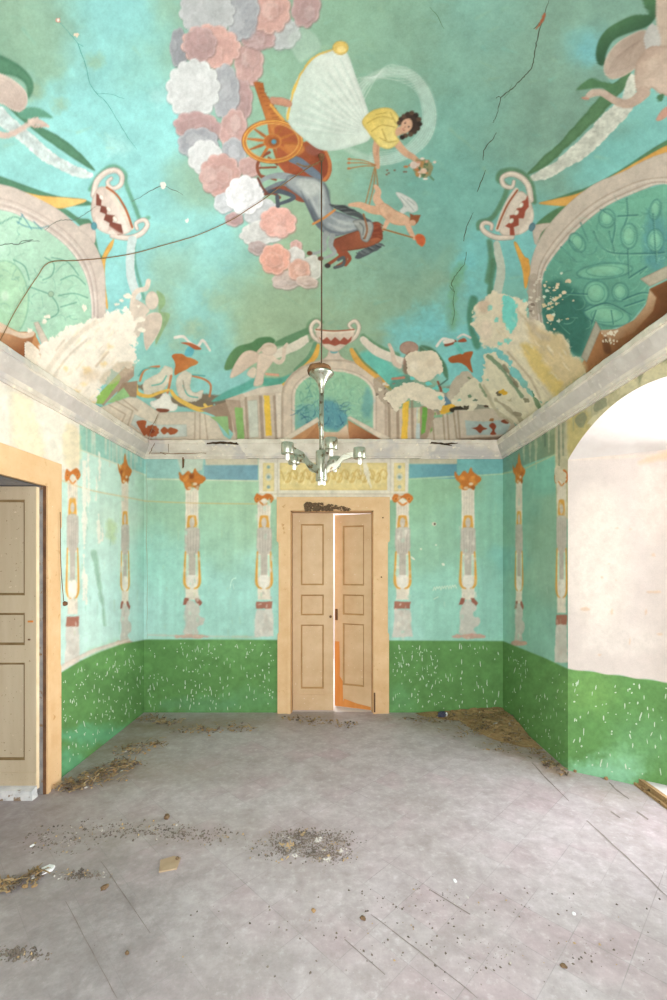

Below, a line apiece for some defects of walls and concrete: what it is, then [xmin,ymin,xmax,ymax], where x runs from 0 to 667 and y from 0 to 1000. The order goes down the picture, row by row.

crack [61,24,136,148]
crack [450,1,549,324]
peeling [24,292,147,405]
peeling [372,267,589,425]